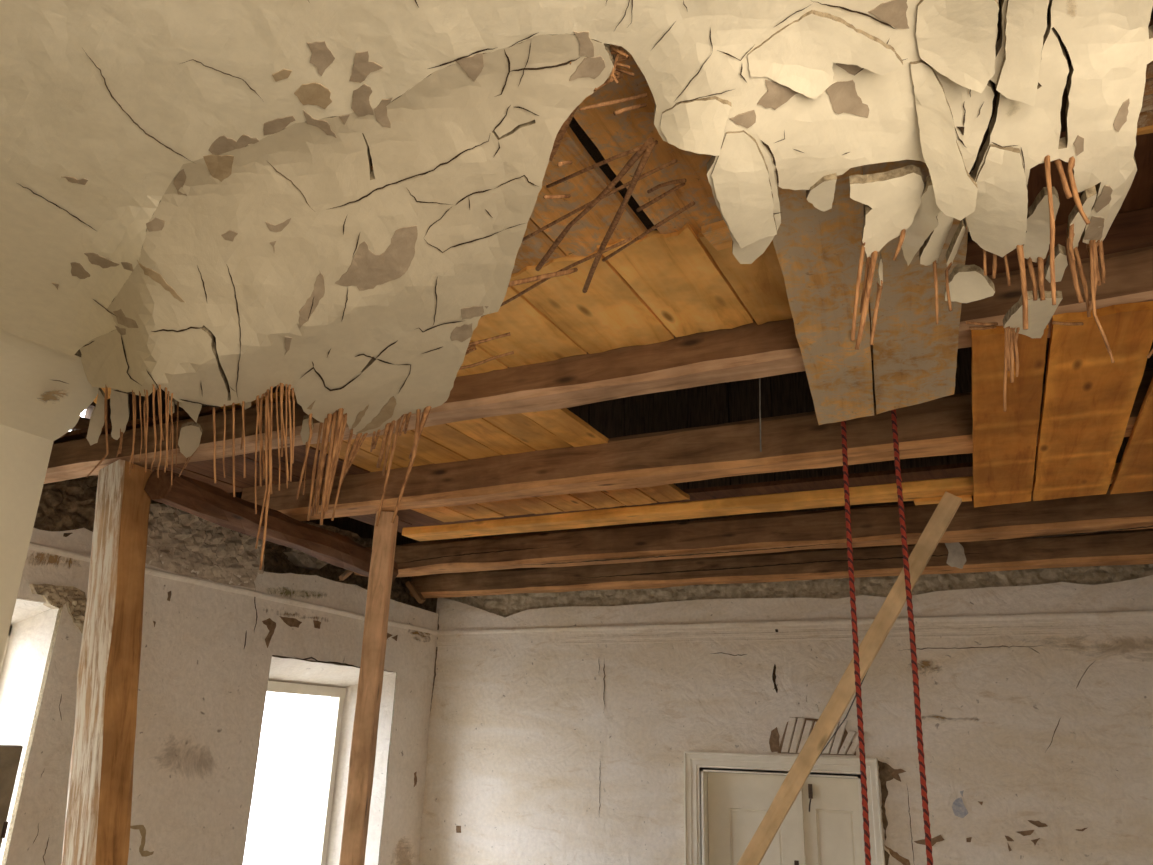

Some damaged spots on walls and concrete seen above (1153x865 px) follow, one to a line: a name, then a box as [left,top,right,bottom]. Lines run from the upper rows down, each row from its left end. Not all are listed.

crack [676,29,752,103]
crack [773,1,906,60]
crack [994,0,1002,43]
crack [1047,5,1071,132]
peeling [660,0,1046,257]
crack [955,81,1025,174]
crack [268,32,580,392]
flaking render [33,476,98,537]
flaking render [145,503,373,590]
flaking render [390,577,411,604]
flaking render [445,576,898,617]
flaking render [911,564,1153,595]